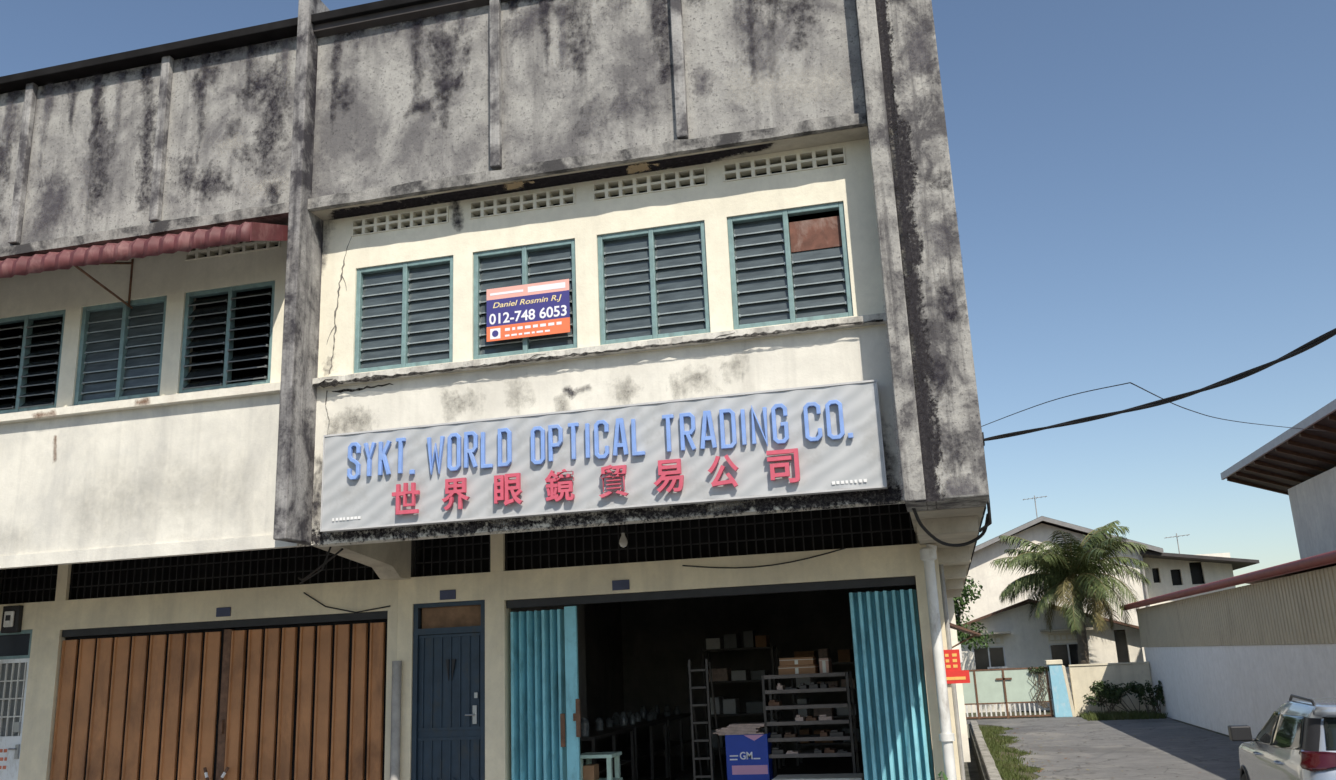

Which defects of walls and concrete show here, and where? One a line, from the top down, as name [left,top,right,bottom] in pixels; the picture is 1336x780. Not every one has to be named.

damp [37,178,64,228]
damp [41,67,155,209]
damp [180,38,289,203]
crack [312,236,883,435]
damp [300,0,976,547]